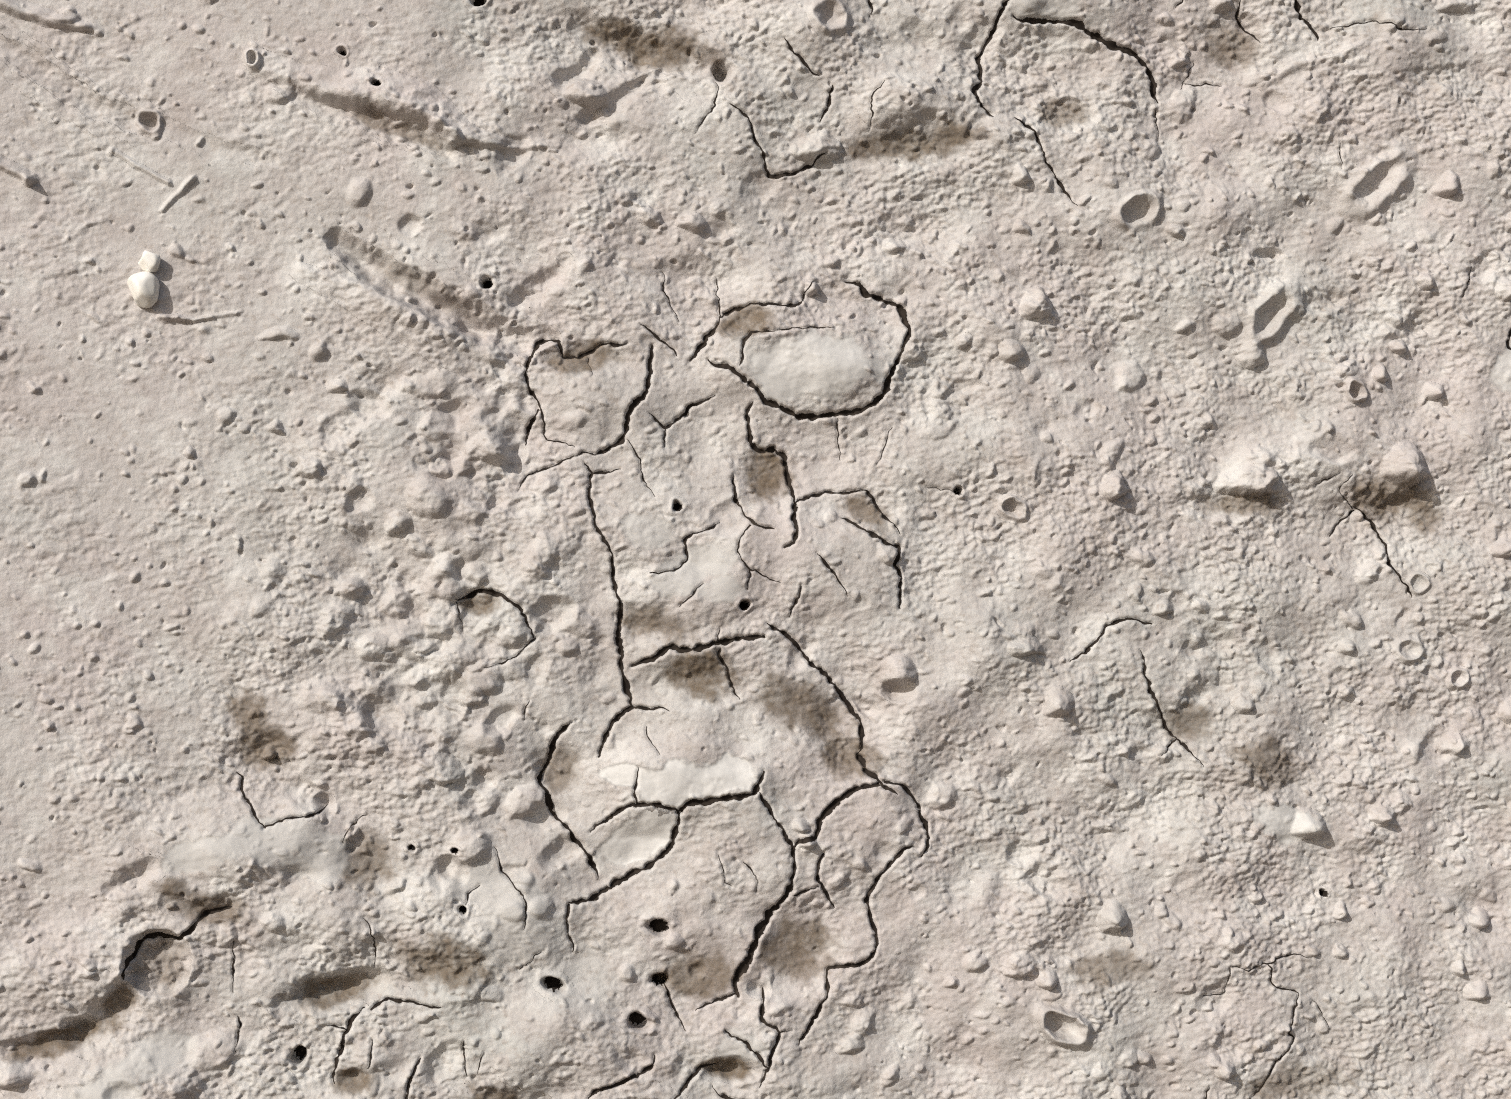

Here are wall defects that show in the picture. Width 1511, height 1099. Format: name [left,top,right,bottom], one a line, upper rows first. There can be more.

crack [1235,0,1260,42]
crack [1294,0,1427,41]
crack [694,37,834,179]
crack [868,80,885,131]
crack [972,0,1218,205]
crack [1315,473,1412,597]
crack [456,273,930,1099]
crack [1069,618,1204,767]
crack [236,772,367,843]
crack [121,906,242,1052]
crack [1203,953,1329,1099]